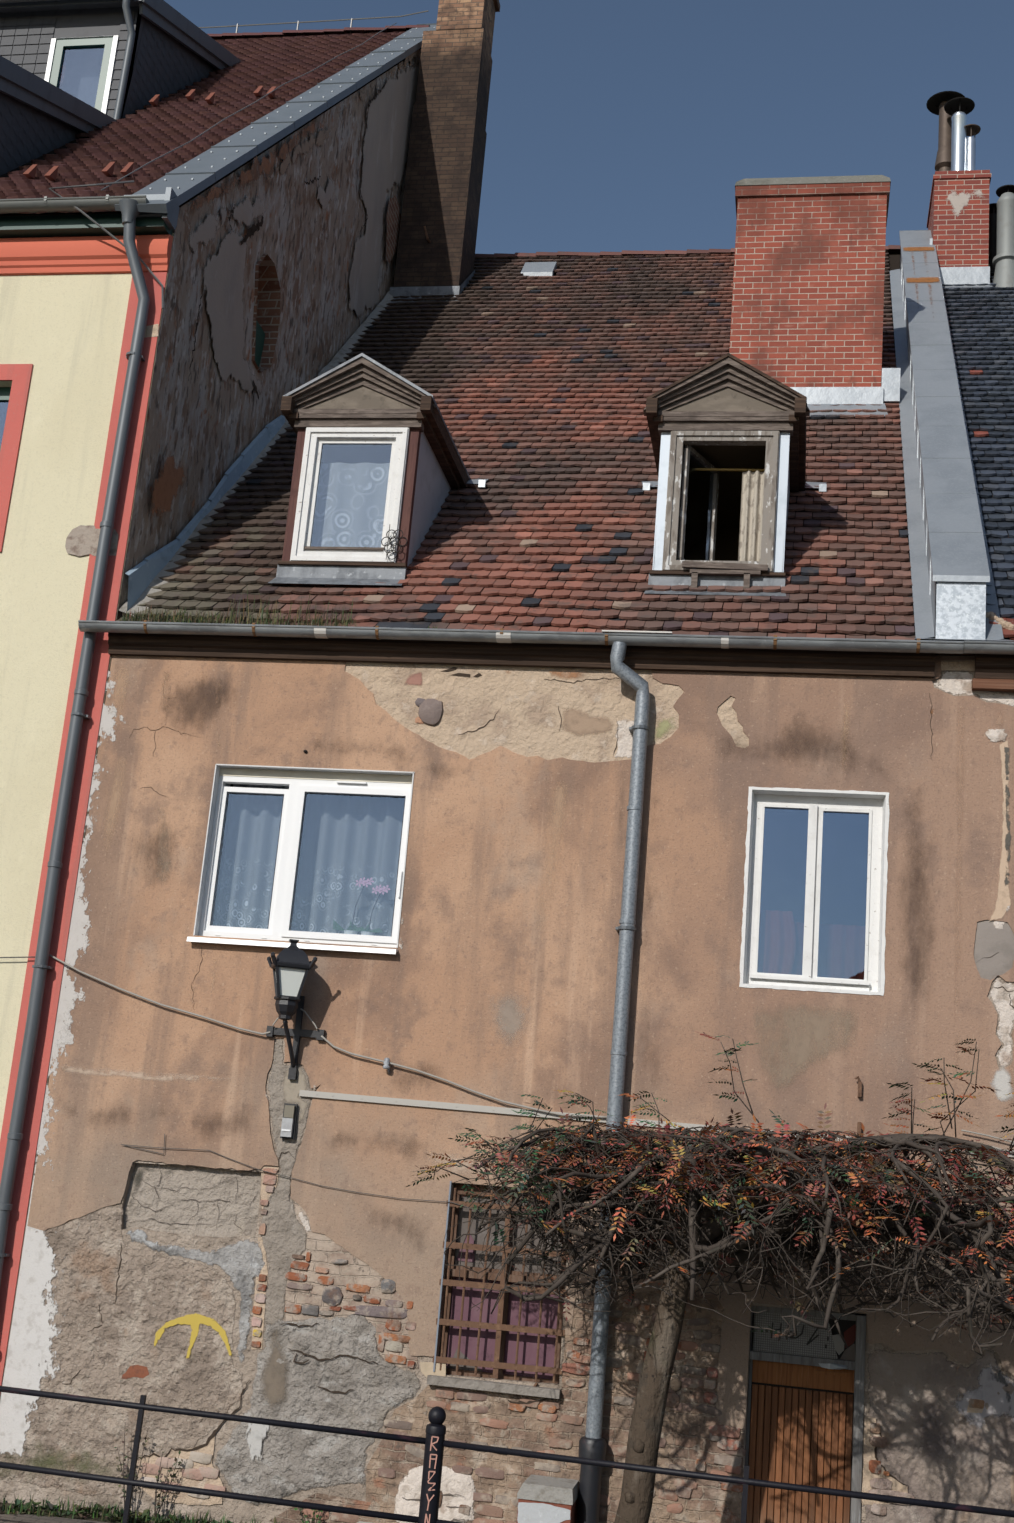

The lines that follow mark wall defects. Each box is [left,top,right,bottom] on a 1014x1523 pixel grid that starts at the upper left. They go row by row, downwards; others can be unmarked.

peeling [185,120,324,395]
peeling [349,63,420,316]
peeling [345,662,684,763]
peeling [717,696,749,748]
peeling [934,660,1014,706]
peeling [0,671,419,1505]
peeling [990,977,1014,1101]
crack [129,1151,294,1230]
crack [283,1323,378,1394]
flaking render [269,1290,662,1523]
flaking render [648,1290,747,1523]
peeling [861,1349,1014,1523]